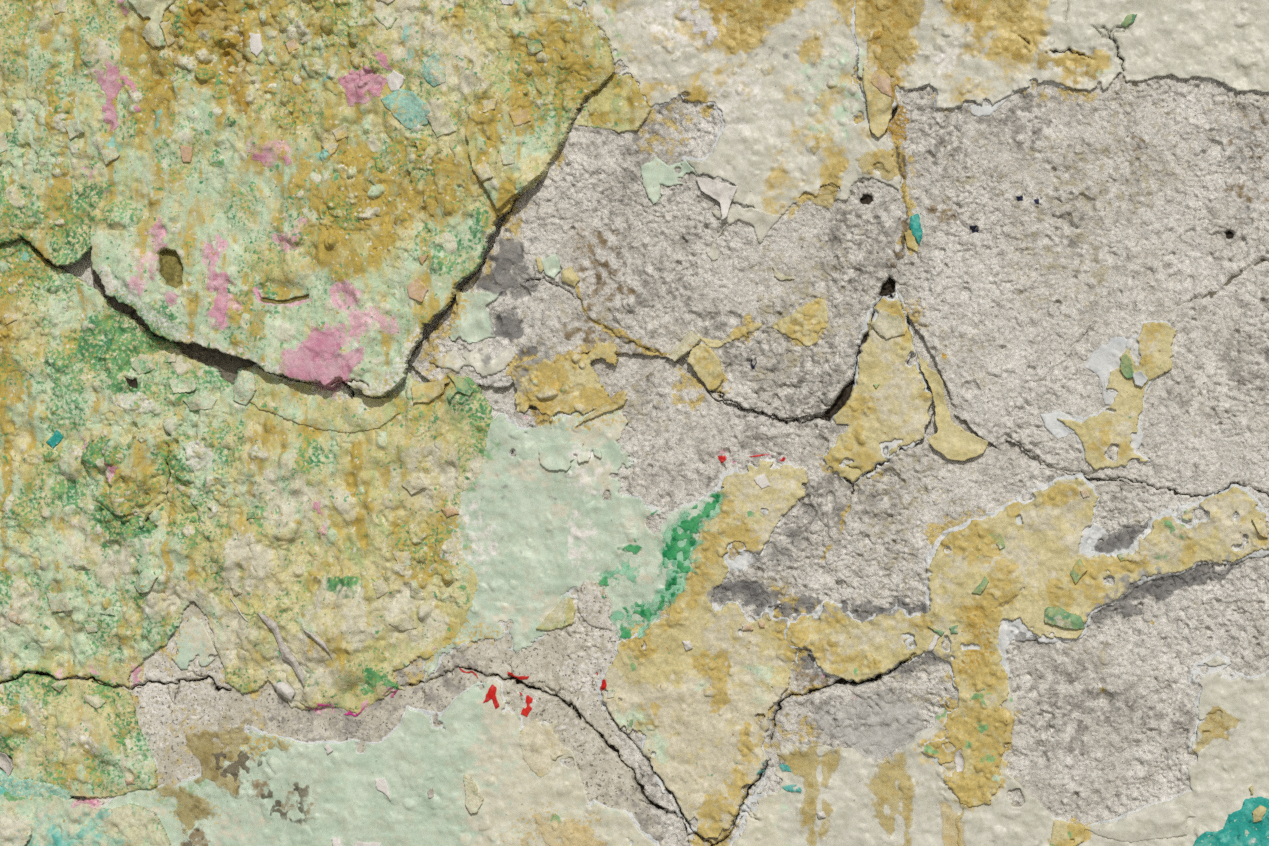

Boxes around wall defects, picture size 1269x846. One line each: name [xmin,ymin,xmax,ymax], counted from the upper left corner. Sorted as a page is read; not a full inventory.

peeling [128,0,176,48]
peeling [249,33,263,57]
peeling [381,70,456,137]
crack [1176,258,1267,307]
crack [711,296,935,424]
spalling [407,0,1269,826]
peeling [0,238,493,710]
crack [1017,442,1269,519]
peeling [0,359,848,846]
crack [1,671,51,683]
crack [82,675,230,701]
crack [452,659,909,846]